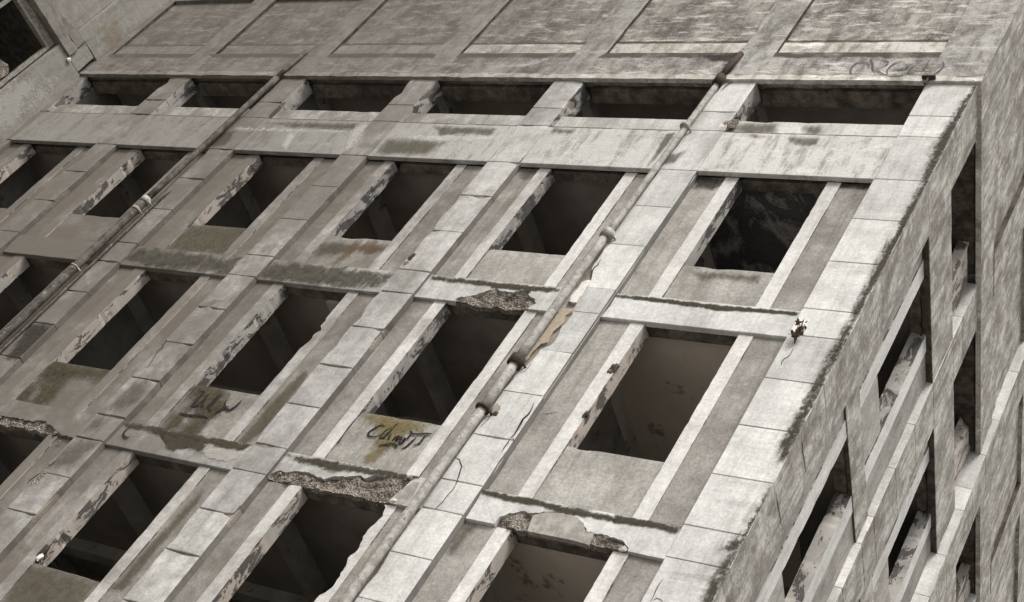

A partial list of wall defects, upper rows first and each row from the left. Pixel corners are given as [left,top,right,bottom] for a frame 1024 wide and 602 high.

water stain [319,243,384,254]
water stain [779,85,976,460]
spalling [454,289,535,316]
water stain [16,361,111,404]
spalling [0,416,72,442]
crack [502,403,558,451]
spalling [269,470,420,507]
spalling [496,512,624,554]